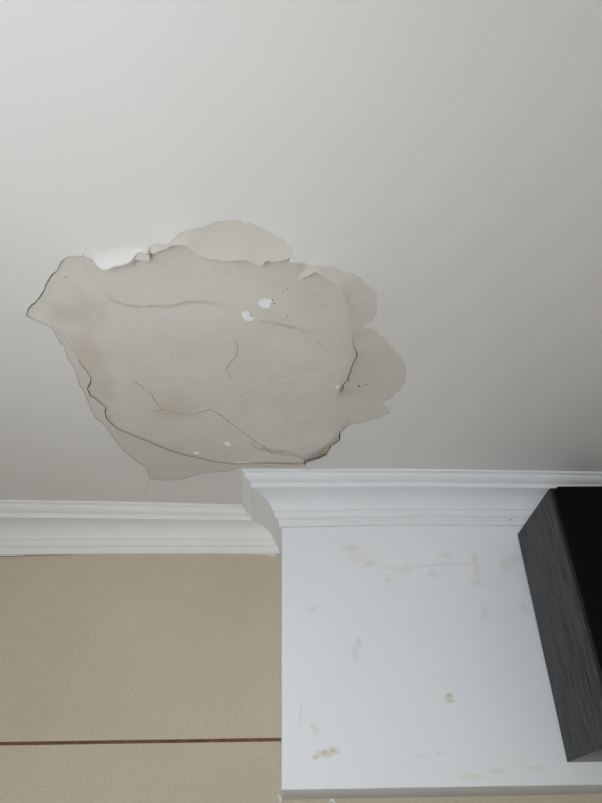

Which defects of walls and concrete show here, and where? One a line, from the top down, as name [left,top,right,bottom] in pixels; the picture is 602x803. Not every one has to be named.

peeling [26,219,407,480]